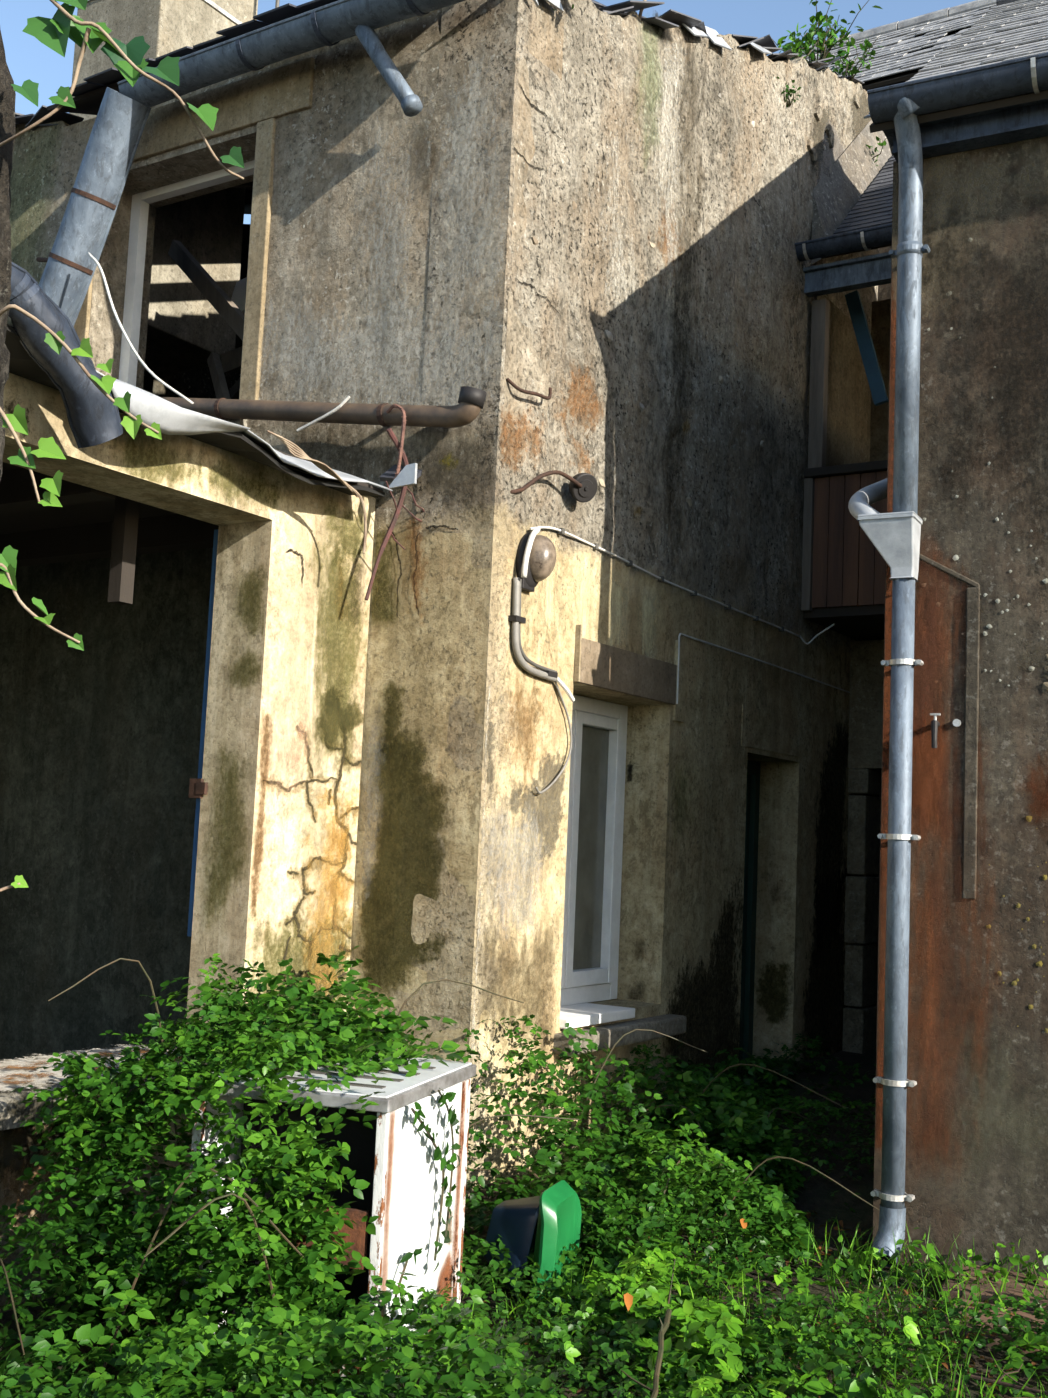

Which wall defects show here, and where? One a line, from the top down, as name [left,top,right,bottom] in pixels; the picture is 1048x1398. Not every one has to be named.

leakage [319,515,393,743]
rust [912,567,949,818]
crack [263,698,362,979]
leakage [265,685,444,1009]
leakage [664,878,743,1081]
leakage [802,724,848,1060]